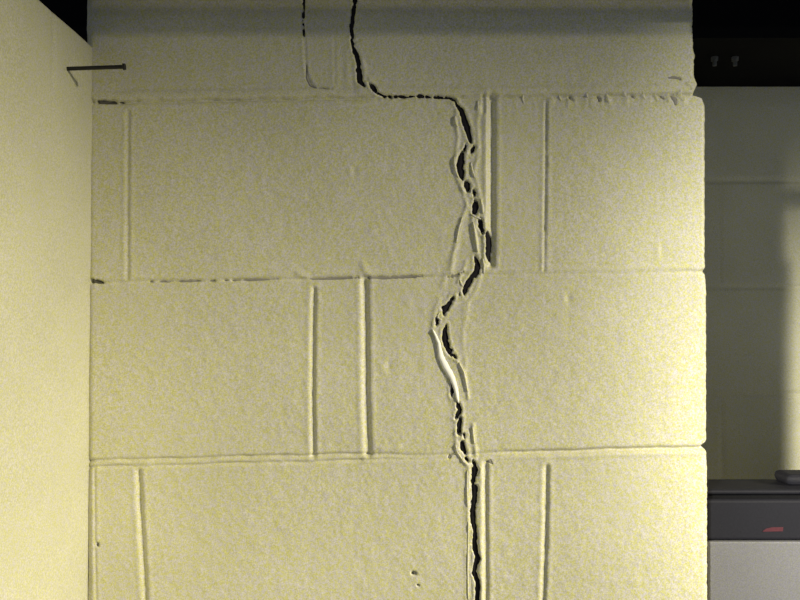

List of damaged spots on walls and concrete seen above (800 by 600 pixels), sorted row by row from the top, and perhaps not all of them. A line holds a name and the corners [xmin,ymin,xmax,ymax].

crack [299,0,307,37]
crack [306,65,327,89]
crack [150,277,272,285]
crack [310,273,422,281]
crack [349,0,492,600]